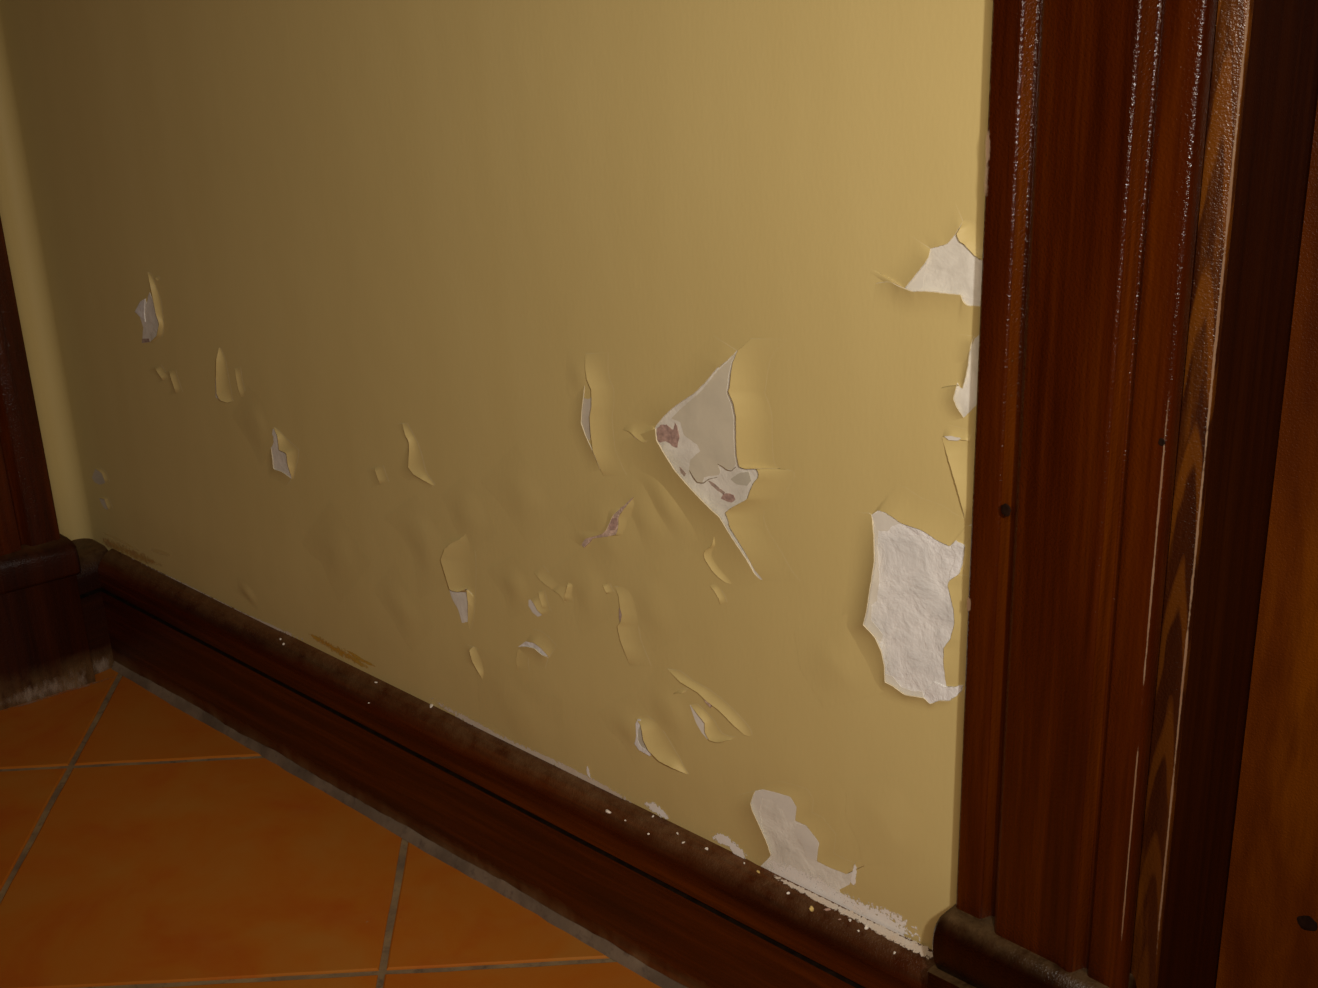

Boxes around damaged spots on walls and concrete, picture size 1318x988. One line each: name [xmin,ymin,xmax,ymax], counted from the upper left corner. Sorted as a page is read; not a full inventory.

peeling [135,272,164,343]
peeling [267,428,299,486]
peeling [568,336,800,604]
peeling [842,204,983,711]
peeling [441,534,476,629]
peeling [635,716,689,774]
peeling [667,669,752,743]
peeling [730,781,865,898]